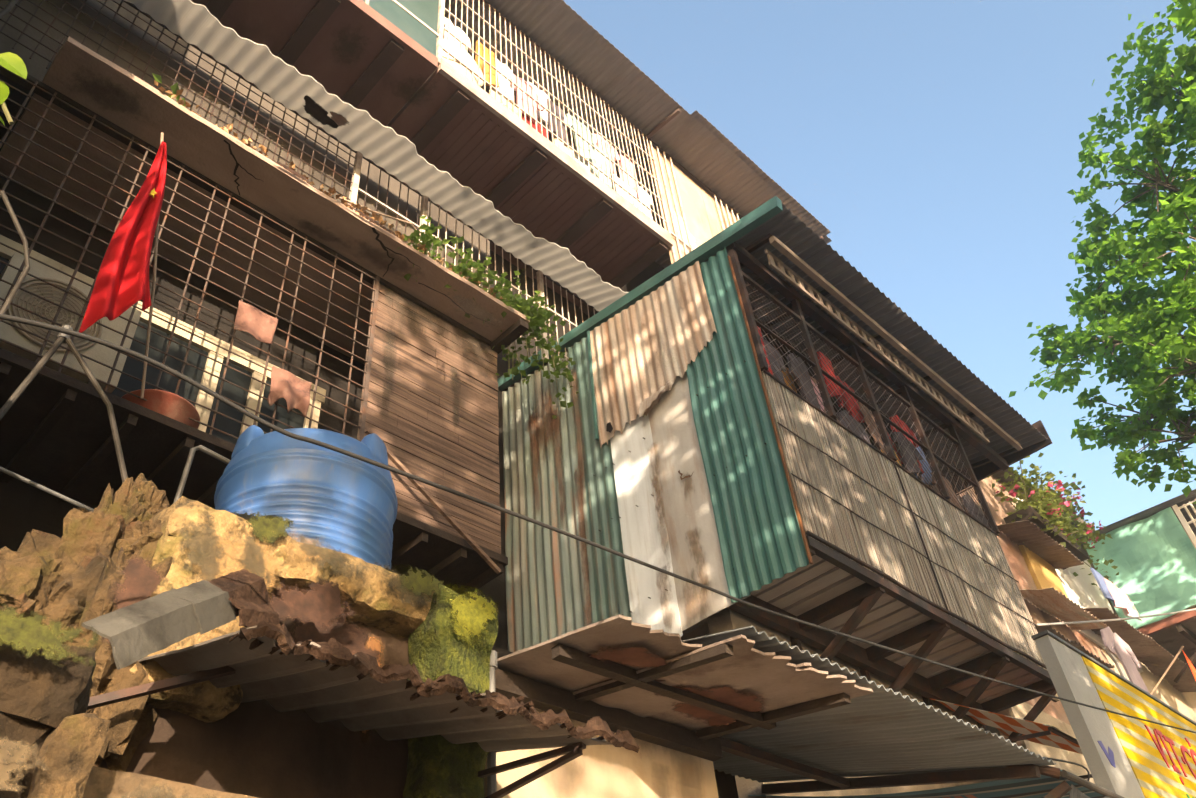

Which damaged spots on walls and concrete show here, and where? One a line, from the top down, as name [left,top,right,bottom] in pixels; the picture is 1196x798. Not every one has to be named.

crack [224,140,264,195]
crack [372,227,495,326]
corrosion [529,369,591,625]
corrosion [651,445,668,545]
corrosion [365,636,382,667]
corrosion [588,647,765,727]